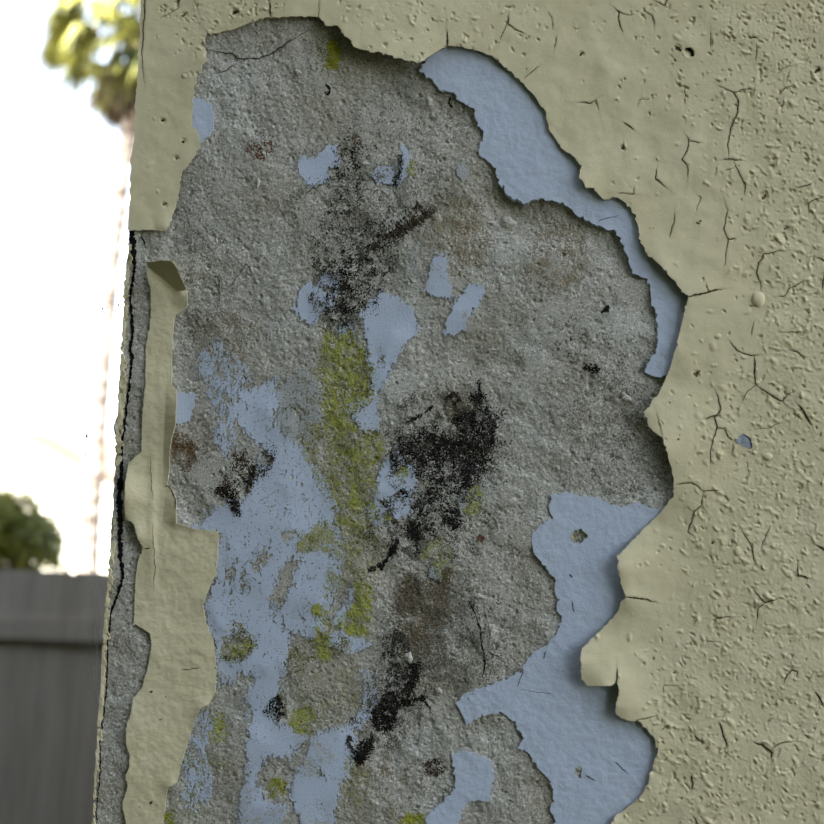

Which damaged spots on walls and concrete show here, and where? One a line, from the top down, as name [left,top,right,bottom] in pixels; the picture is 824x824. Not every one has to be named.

crack [616,0,668,31]
crack [716,87,755,193]
water stain [170,74,502,397]
water stain [514,207,602,300]
crack [689,285,722,297]
spalling [92,16,675,824]
crack [706,390,749,472]
crack [731,323,812,425]
crack [96,231,147,824]
water stain [199,305,672,824]
crack [678,482,728,535]
crack [754,741,790,757]